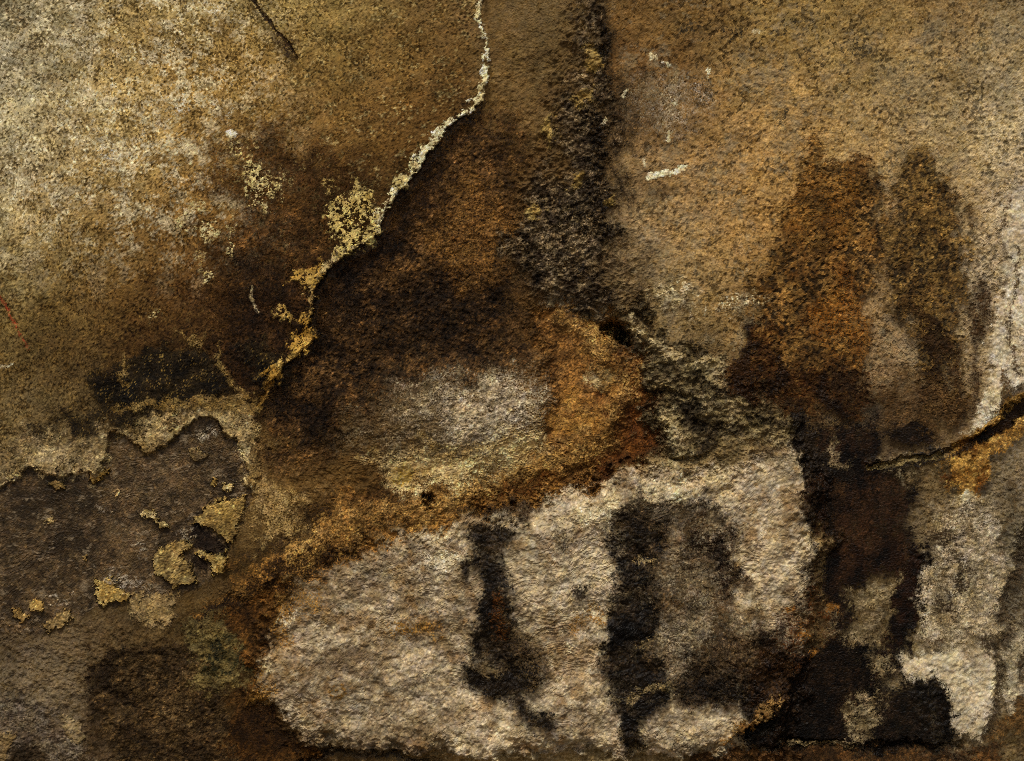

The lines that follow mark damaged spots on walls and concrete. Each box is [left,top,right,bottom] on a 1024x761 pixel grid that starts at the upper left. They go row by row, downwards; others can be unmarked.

peeling [0,394,262,638]
crack [252,0,490,412]
leakage [26,0,765,558]
leakage [457,520,570,738]
leakage [596,184,1024,761]
crack [866,393,1024,471]